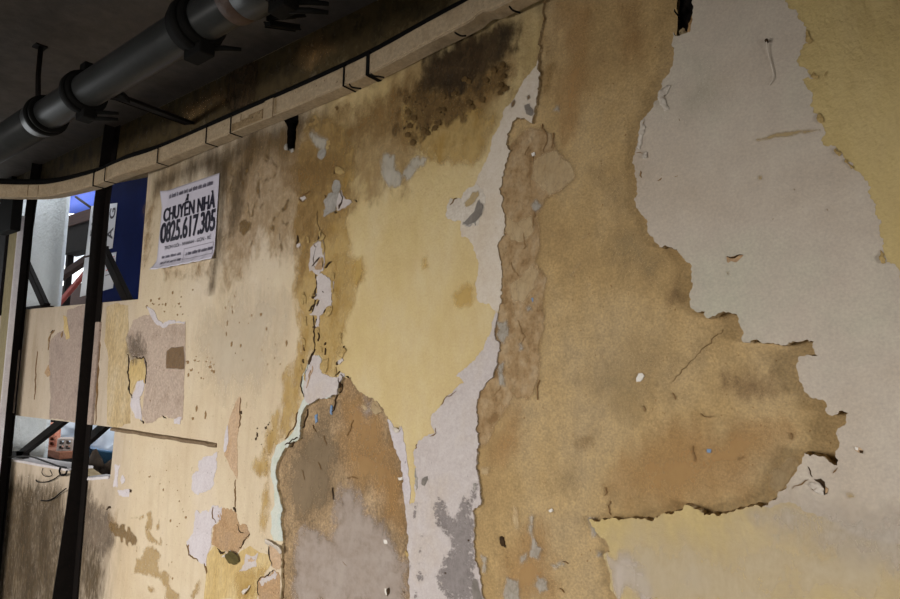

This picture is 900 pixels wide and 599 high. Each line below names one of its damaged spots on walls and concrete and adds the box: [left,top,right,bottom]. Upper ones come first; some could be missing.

leakage [116,0,453,159]
peeling [104,291,215,428]
leakage [186,23,517,477]
flaking render [186,0,900,599]
leakage [0,478,64,599]
leakage [82,486,179,599]